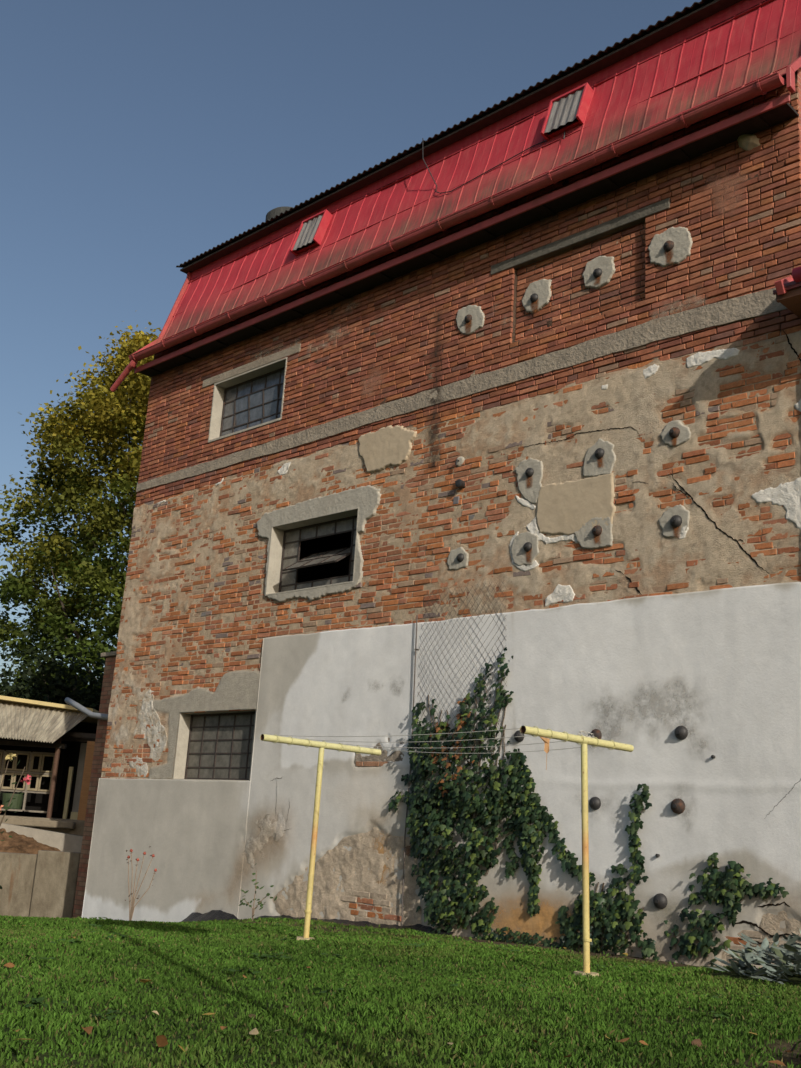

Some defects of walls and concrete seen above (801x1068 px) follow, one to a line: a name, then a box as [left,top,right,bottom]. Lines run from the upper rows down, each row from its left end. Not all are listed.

crack [518,426,640,449]
flaking render [614,335,801,550]
flaking render [509,496,640,573]
crack [637,474,768,573]
flaking render [142,534,188,626]
flaking render [524,584,575,606]
flaking render [589,580,617,594]
flaking render [710,578,733,590]
flaking render [121,686,167,779]
flaking render [354,737,414,767]
flaking render [272,827,422,926]
crack [735,902,793,944]